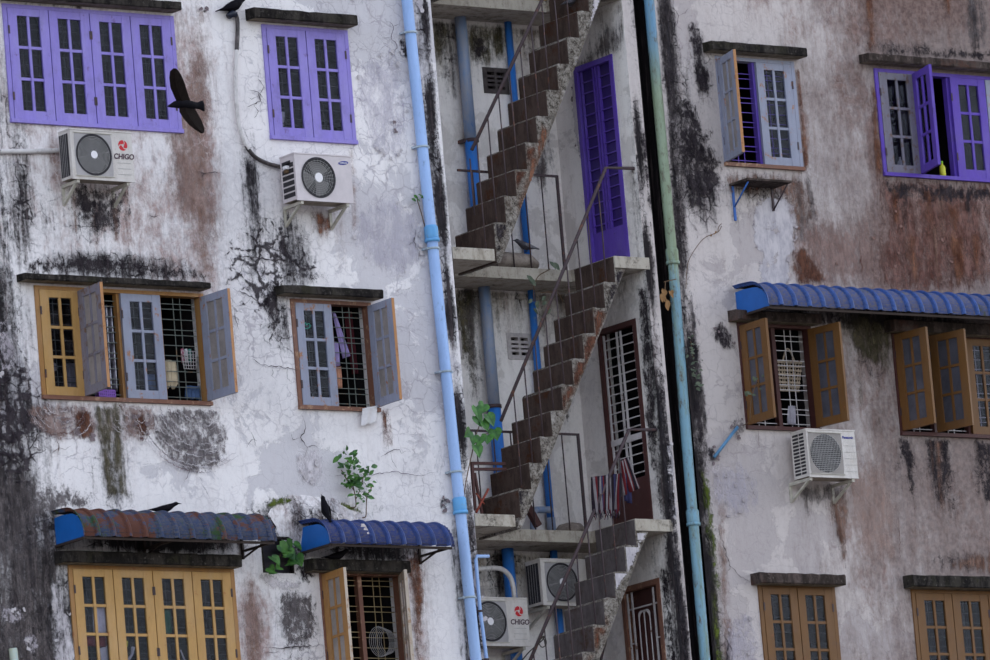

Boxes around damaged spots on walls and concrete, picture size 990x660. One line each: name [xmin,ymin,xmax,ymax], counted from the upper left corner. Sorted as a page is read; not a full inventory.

damp [467,24,504,65]
damp [28,53,216,282]
damp [423,0,457,244]
damp [661,1,811,274]
crack [231,256,296,327]
damp [227,159,322,347]
corrosion [792,249,823,283]
damp [0,340,237,660]
damp [798,484,842,512]
damp [899,438,915,494]
damp [925,438,951,503]
damp [974,438,990,505]